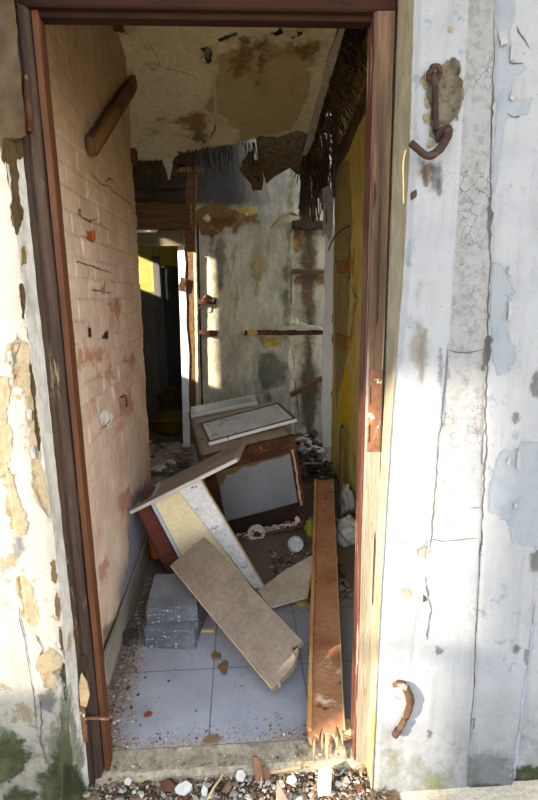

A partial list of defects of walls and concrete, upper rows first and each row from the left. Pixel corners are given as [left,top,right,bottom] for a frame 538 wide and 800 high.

damp [176,113,208,143]
peeling [490,0,533,191]
peeling [1,137,24,235]
peeling [490,262,517,376]
damp [250,353,286,403]
crack [427,27,531,747]
peeling [0,336,51,557]
peeling [488,441,538,549]
crack [424,577,432,639]
damp [3,785,38,800]
damp [62,762,87,800]